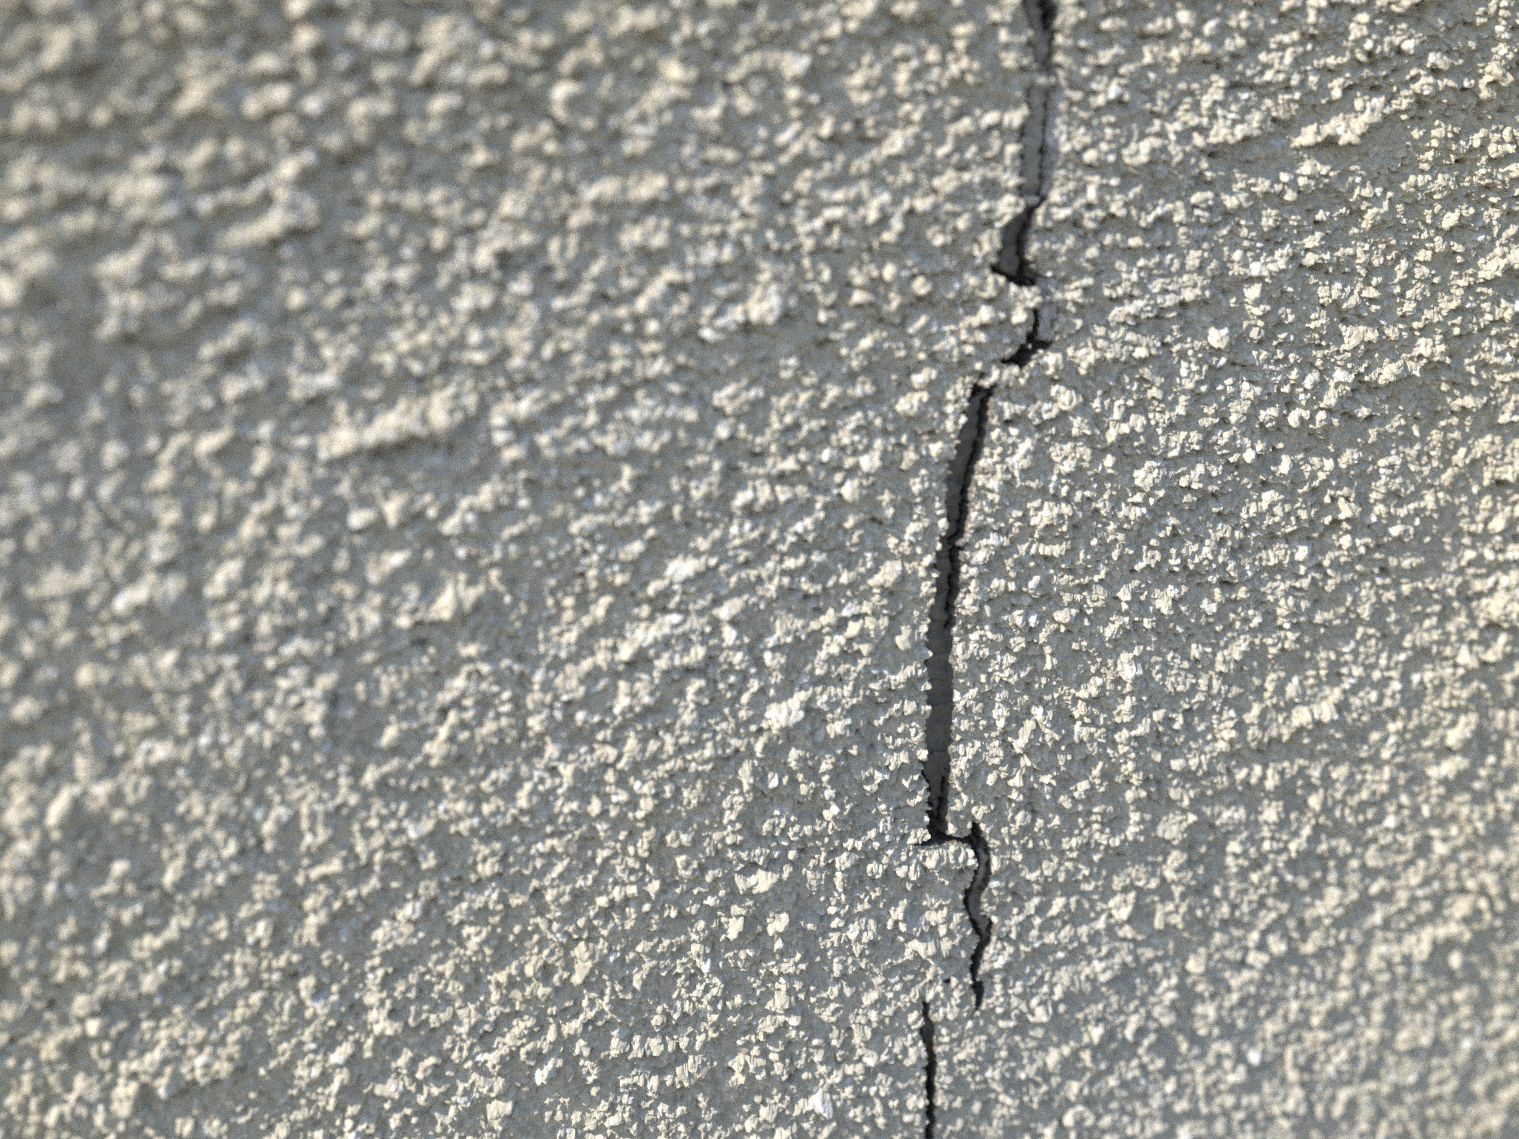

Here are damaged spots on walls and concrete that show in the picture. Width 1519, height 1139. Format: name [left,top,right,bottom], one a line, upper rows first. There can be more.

crack [914,0,1071,1139]